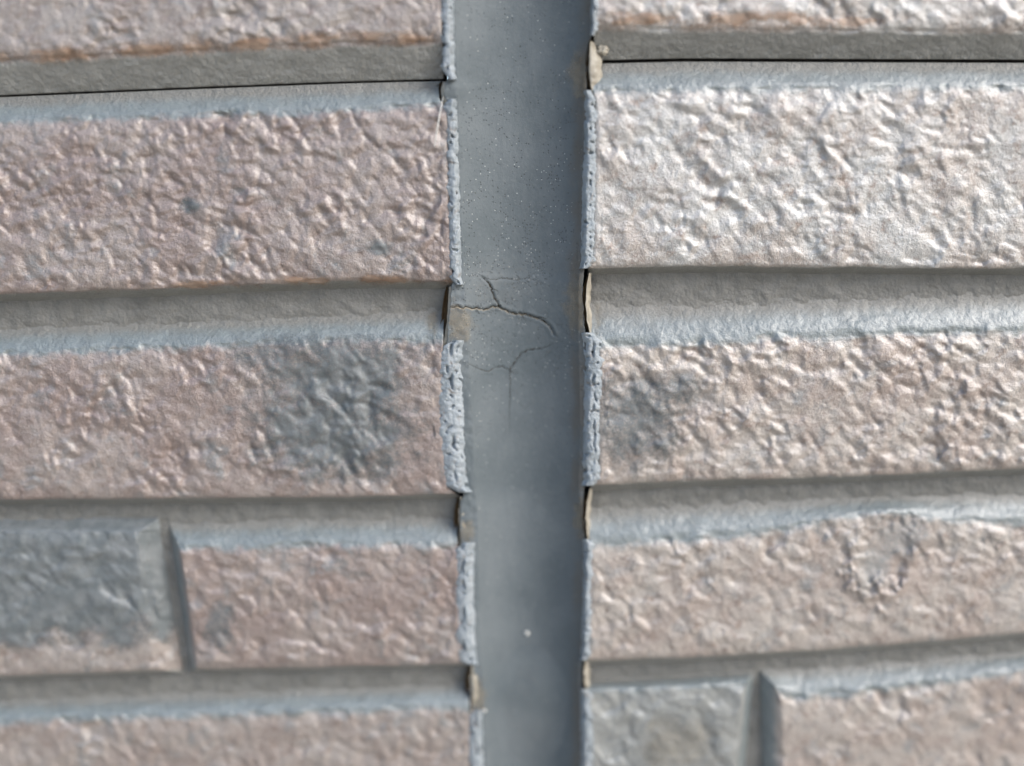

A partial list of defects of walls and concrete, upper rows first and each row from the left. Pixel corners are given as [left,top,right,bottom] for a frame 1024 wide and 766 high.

peeling [585,39,609,95]
peeling [440,286,452,346]
peeling [582,273,592,333]
crack [451,277,554,417]
peeling [454,496,465,547]